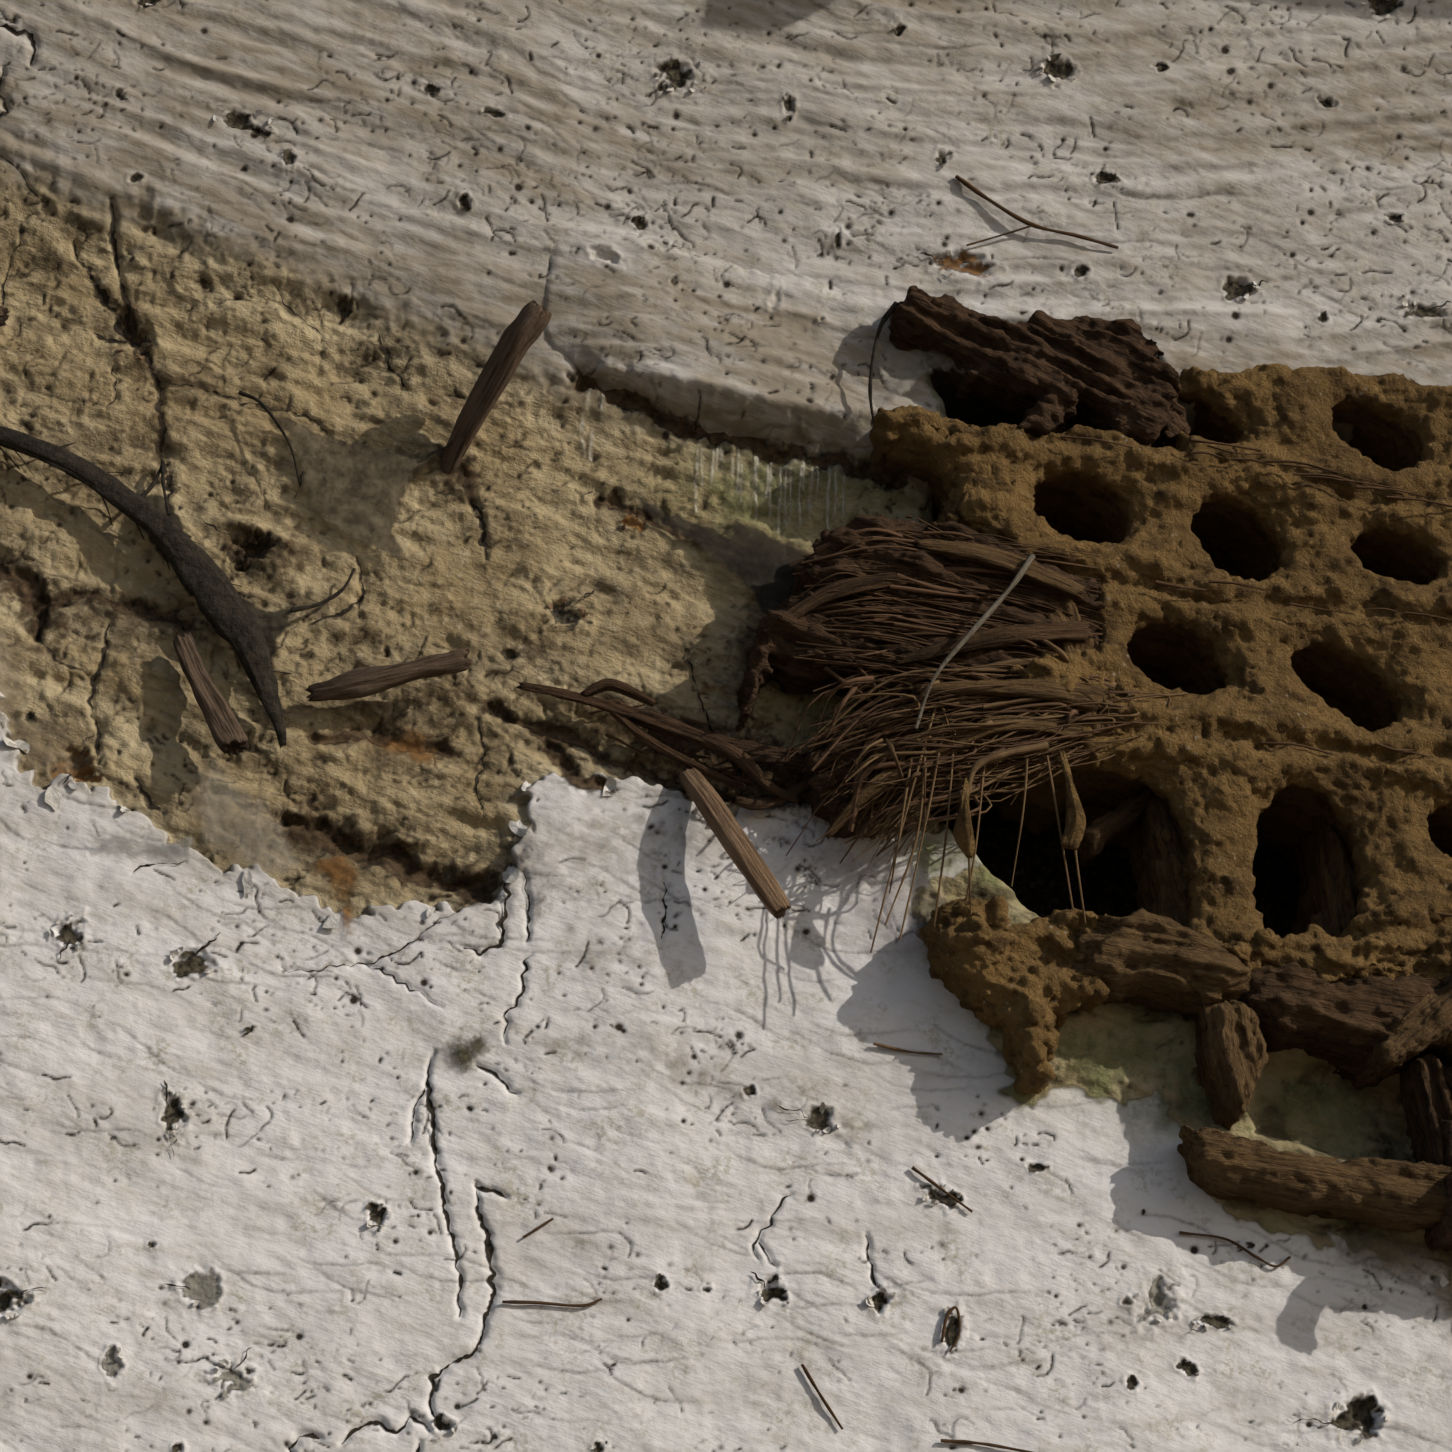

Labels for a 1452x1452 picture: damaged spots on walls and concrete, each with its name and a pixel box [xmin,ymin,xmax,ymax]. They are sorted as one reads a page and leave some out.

crack [0,23,36,116]
crack [0,155,328,498]
crack [378,332,408,390]
flaking render [0,164,928,929]
flaking render [908,864,1039,928]
spalling [169,932,221,977]
crack [281,912,458,1007]
crack [464,863,532,1094]
spalling [161,1080,187,1155]
flaking render [987,1002,1416,1163]
spalling [366,1202,387,1232]
crack [289,1053,505,1452]